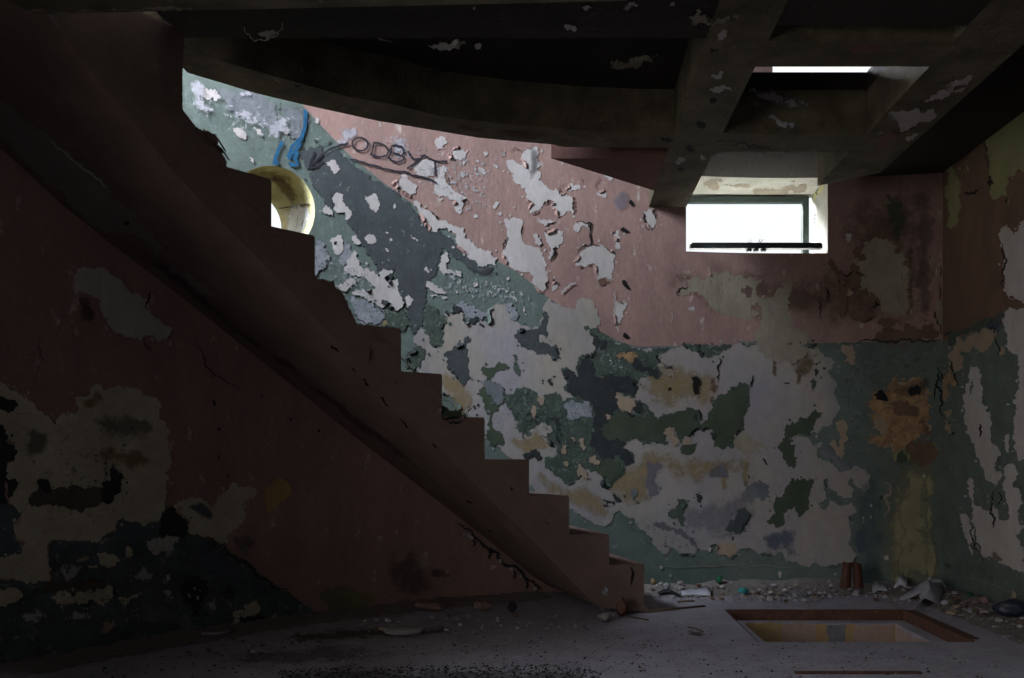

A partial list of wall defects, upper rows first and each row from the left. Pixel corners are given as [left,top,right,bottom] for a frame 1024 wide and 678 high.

peeling [200,88,221,101]
peeling [233,127,262,140]
peeling [321,128,356,220]
peeling [365,193,380,213]
peeling [887,75,972,142]
peeling [73,266,175,346]
peeling [315,232,413,325]
peeling [389,136,892,578]
spalling [865,220,1024,572]
peeling [0,377,260,634]
water stain [886,463,937,582]
crack [969,491,1003,572]